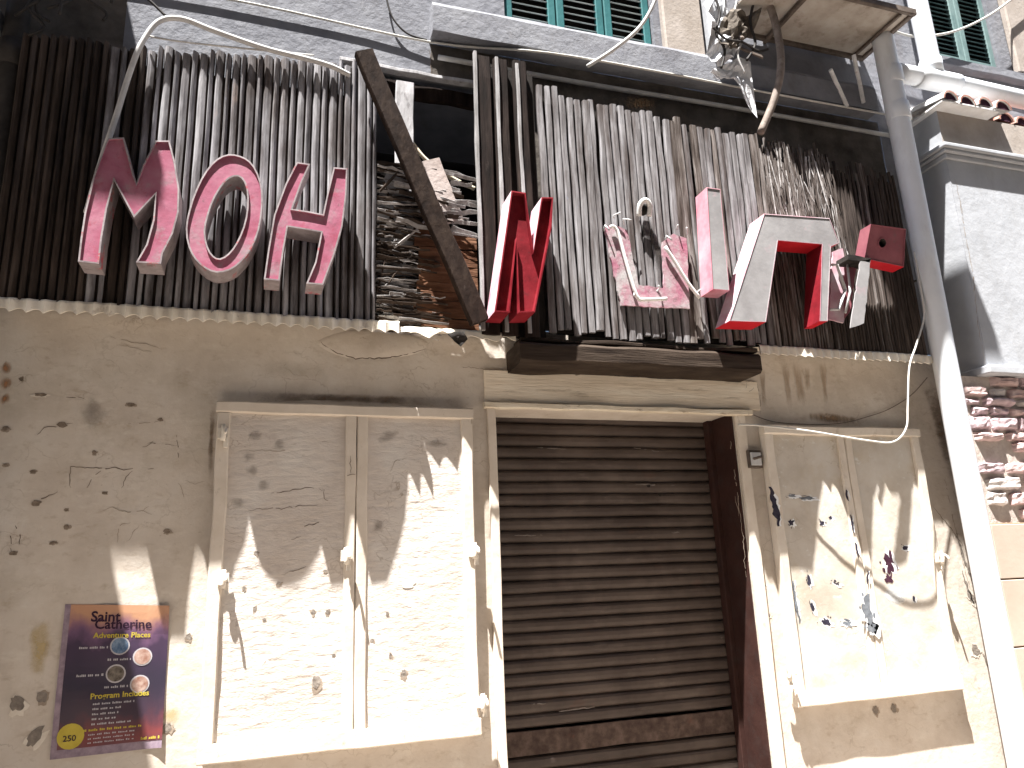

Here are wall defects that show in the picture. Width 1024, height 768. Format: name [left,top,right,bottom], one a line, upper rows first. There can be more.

crack [31,418,179,542]
peeling [769,487,819,529]
peeling [792,544,912,639]
spalling [9,690,50,717]
spalling [22,725,50,751]